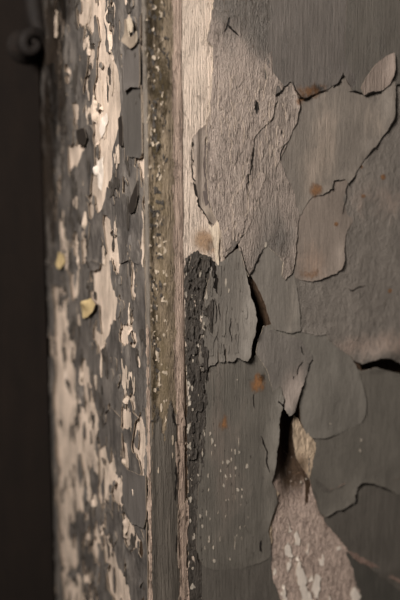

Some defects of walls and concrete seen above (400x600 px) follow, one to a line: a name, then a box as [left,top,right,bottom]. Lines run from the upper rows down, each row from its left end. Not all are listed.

crack [273,74,380,99]
crack [191,139,212,227]
peeling [41,0,186,600]
crack [208,258,232,356]
crack [240,247,263,277]
peeling [177,0,400,600]
crack [328,483,394,517]